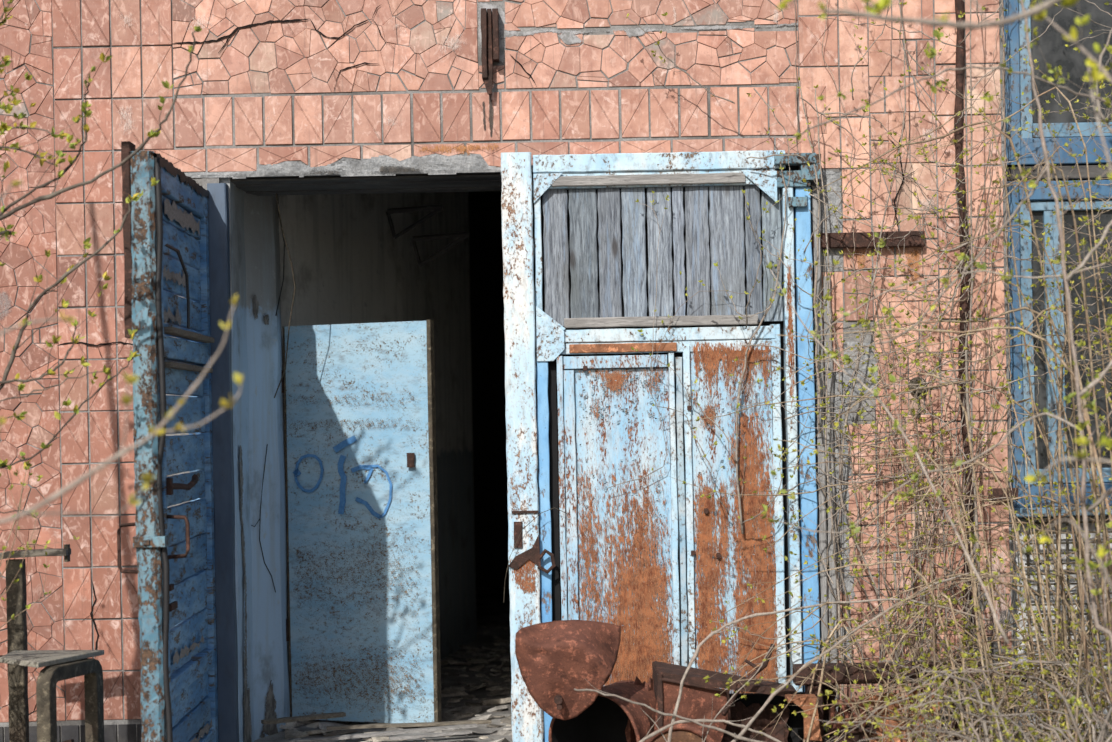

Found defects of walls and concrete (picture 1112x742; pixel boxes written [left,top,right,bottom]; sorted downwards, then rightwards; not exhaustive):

crack [173,5,386,90]
spalling [184,152,501,179]
corrosion [577,367,664,420]
corrosion [690,341,778,694]
corrosion [576,462,673,686]